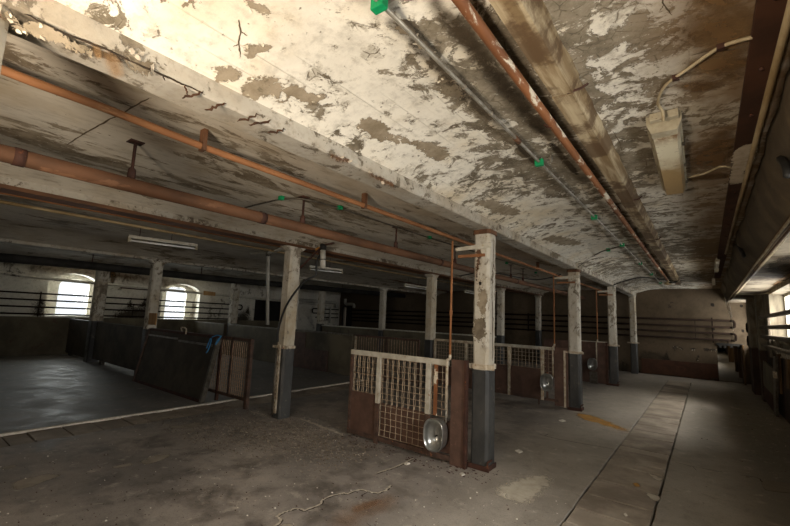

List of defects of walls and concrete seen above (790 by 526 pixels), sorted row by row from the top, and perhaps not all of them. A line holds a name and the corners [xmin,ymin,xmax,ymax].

peeling [245,0,271,16]
peeling [0,10,93,58]
crack [25,14,227,111]
crack [233,20,247,57]
peeling [243,43,272,59]
peeling [211,65,326,105]
peeling [386,19,442,55]
crack [67,98,149,145]
crack [237,113,284,134]
peeling [356,116,450,161]
peeling [472,290,488,341]
crack [274,458,414,526]